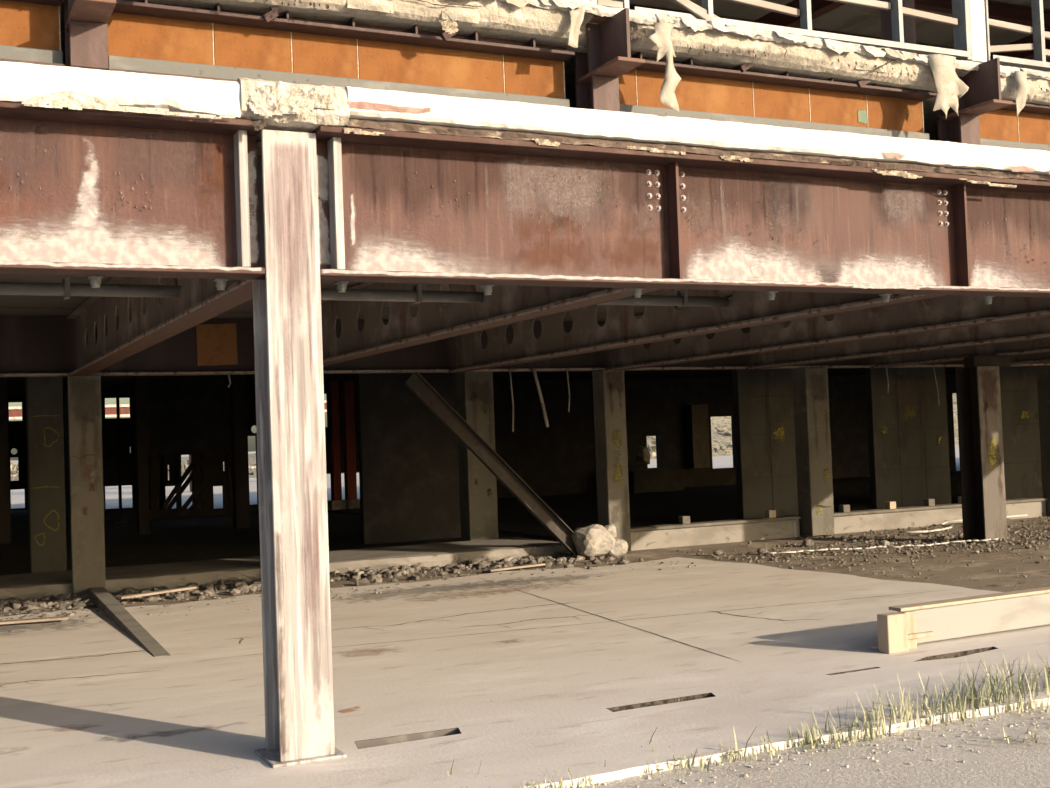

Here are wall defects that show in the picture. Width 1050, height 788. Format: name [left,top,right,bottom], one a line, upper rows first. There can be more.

spalling [439,20,459,34]
spalling [22,90,235,119]
spalling [247,81,336,131]
water stain [0,150,261,271]
water stain [322,194,1050,291]